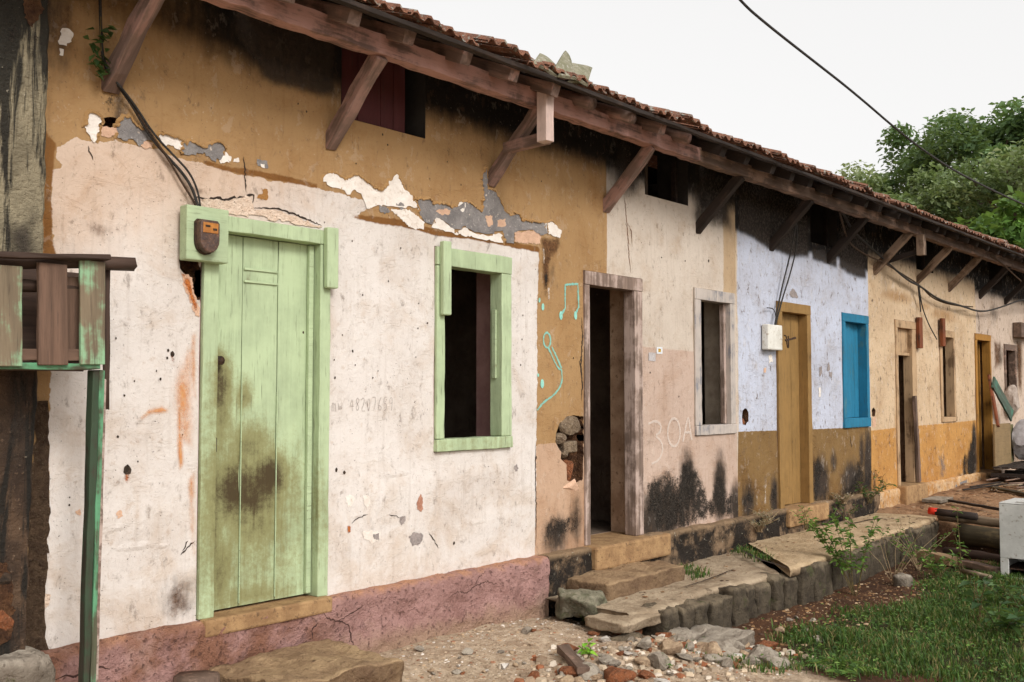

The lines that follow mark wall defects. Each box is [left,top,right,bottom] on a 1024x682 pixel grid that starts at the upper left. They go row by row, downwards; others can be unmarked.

peeling [81,109,239,163]
spalling [198,189,322,228]
peeling [320,165,562,245]
spalling [181,273,200,317]
damp [542,239,559,297]
rust [179,382,188,465]
spalling [555,416,581,491]
damp [647,462,777,530]
damp [813,456,872,500]
damp [546,517,578,541]
crack [311,604,365,645]